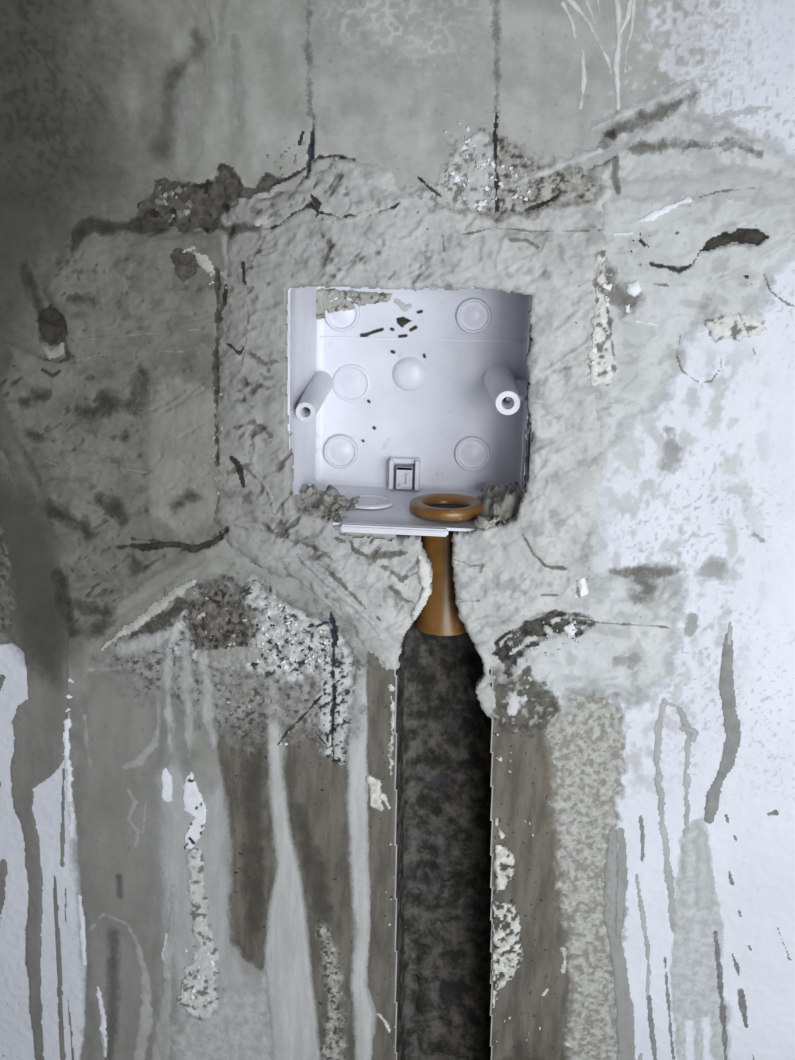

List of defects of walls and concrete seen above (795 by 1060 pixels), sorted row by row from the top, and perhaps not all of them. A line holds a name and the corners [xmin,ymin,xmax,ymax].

spalling [72,164,260,249]
spalling [417,122,604,222]
peeling [40,331,64,360]
crack [208,130,400,495]
leakage [0,450,276,1060]
spalling [98,572,365,765]
spalling [492,610,634,737]
leakage [696,622,741,908]
leakage [282,723,356,1060]
leakage [616,828,657,1060]
leakage [713,931,740,1060]
leakage [738,989,748,1028]